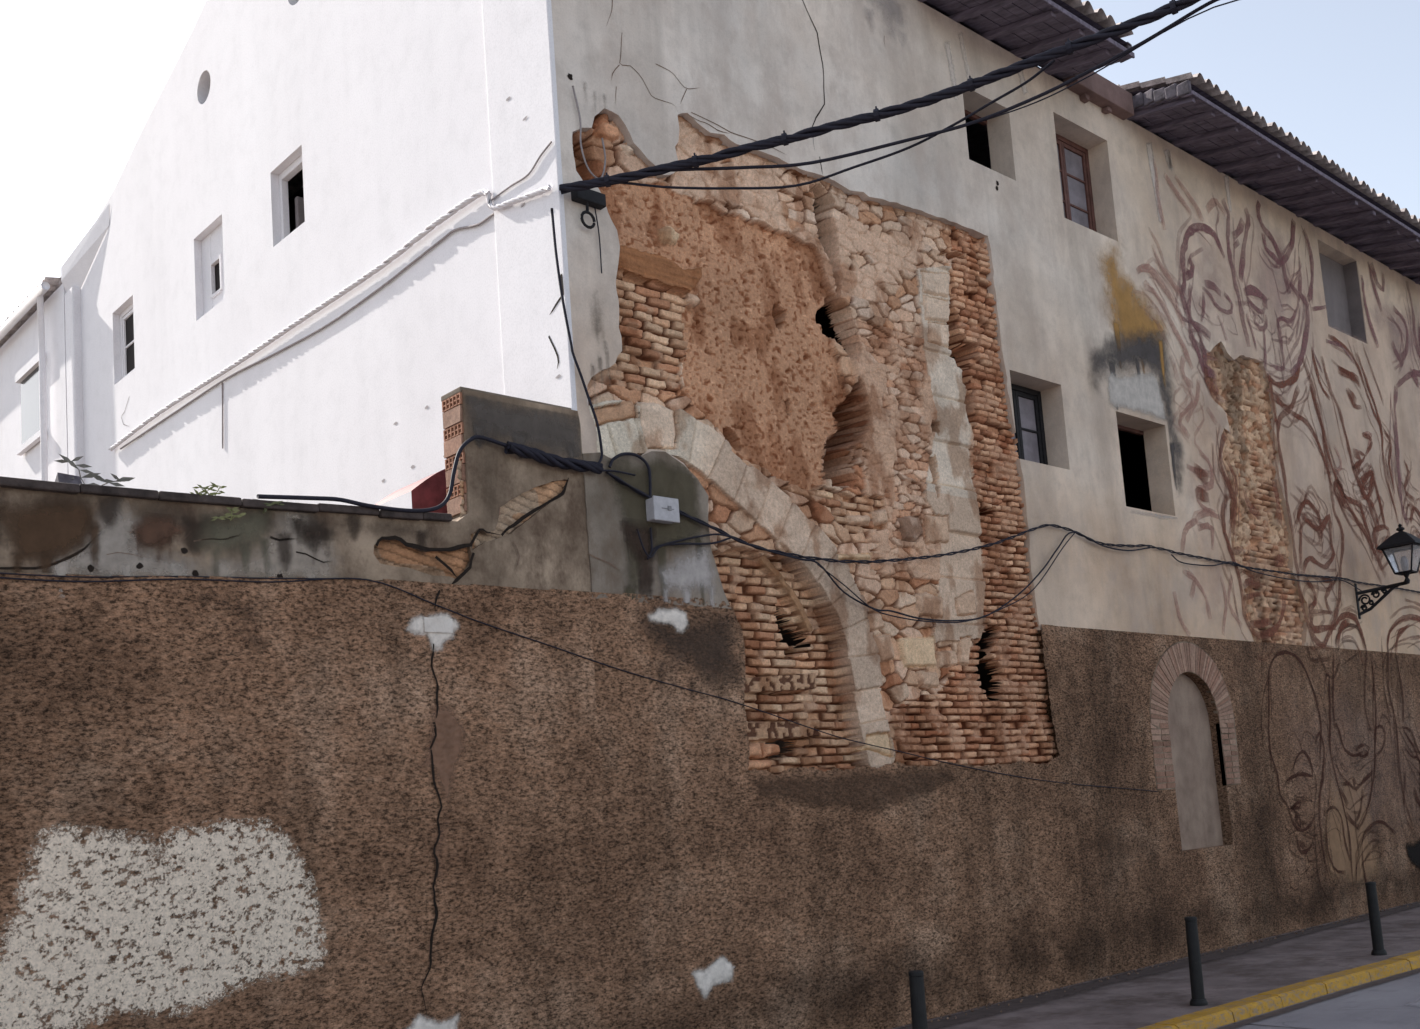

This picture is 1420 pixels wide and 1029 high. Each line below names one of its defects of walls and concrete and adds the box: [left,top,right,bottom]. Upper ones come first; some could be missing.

crack [608,0,825,175]
damp [1104,256,1165,418]
damp [56,499,182,578]
damp [186,514,330,578]
flaking render [373,480,566,579]
crack [375,478,569,604]
spalling [572,113,1058,775]
spalling [1204,343,1305,645]
crack [421,644,443,1015]